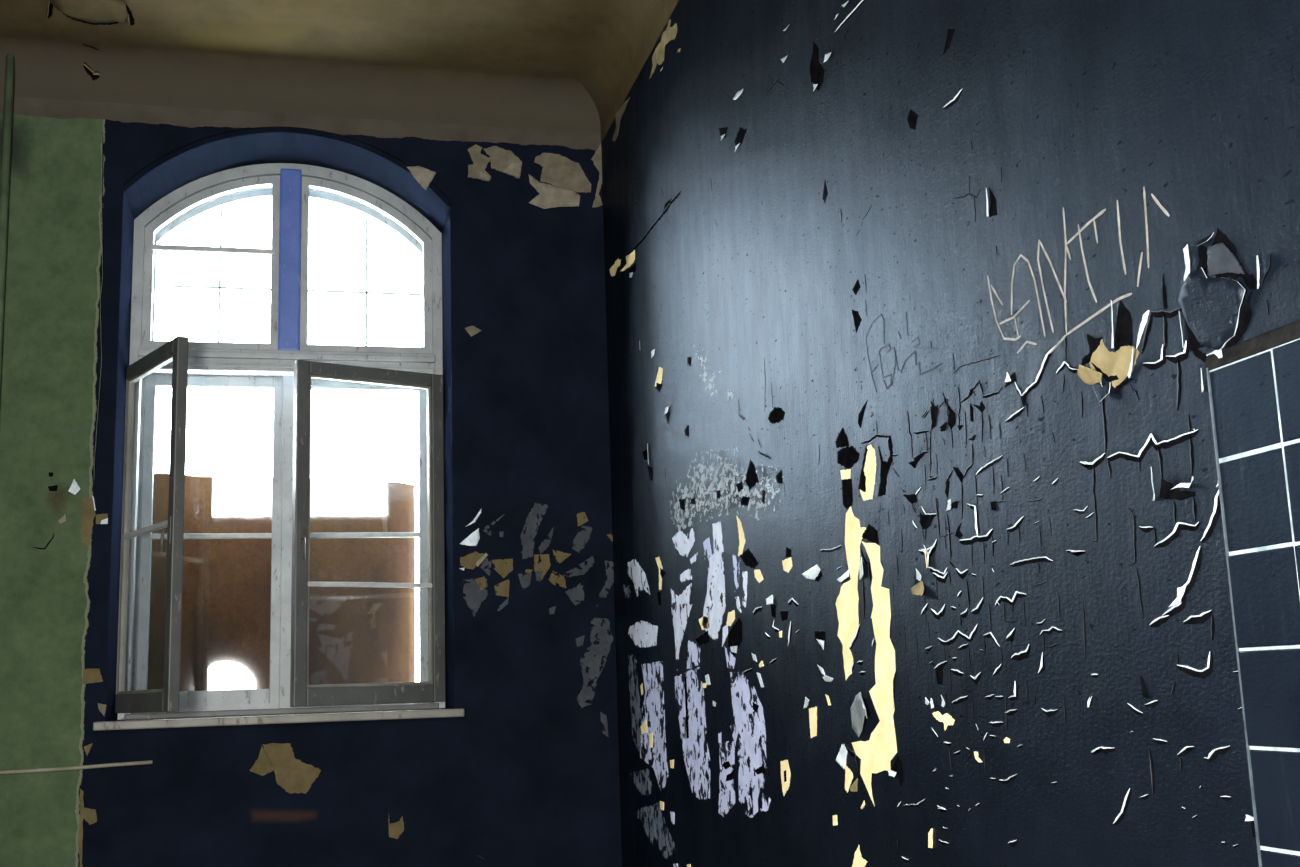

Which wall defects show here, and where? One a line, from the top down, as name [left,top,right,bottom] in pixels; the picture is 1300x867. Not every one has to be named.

peeling [650,20,681,78]
peeling [810,41,831,91]
peeling [943,88,963,109]
peeling [468,97,630,209]
peeling [719,127,747,151]
peeling [986,188,997,217]
peeling [852,278,867,333]
crack [1136,275,1184,354]
peeling [1058,227,1271,410]
peeling [1151,468,1195,501]
peeling [459,341,1039,867]
peeling [249,743,321,794]